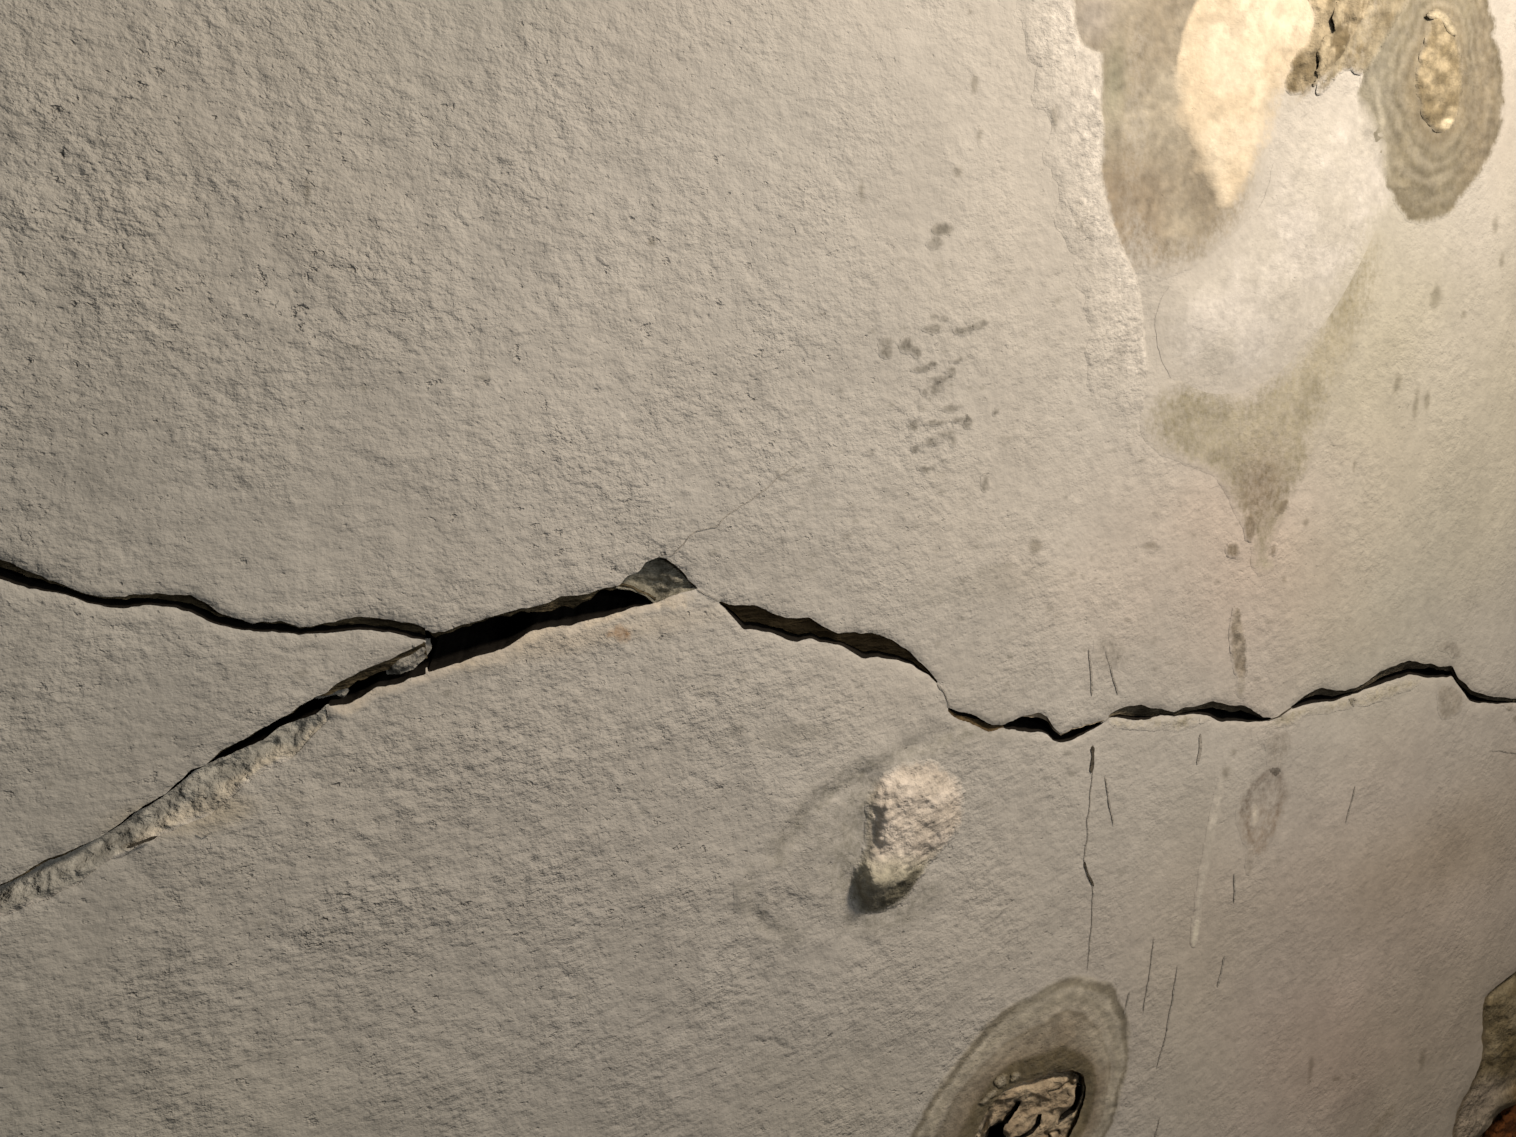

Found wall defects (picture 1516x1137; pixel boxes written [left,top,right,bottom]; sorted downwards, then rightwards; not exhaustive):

peeling [1013,0,1409,415]
water stain [1140,0,1507,576]
crack [0,464,1516,971]
spalling [1452,972,1516,1137]